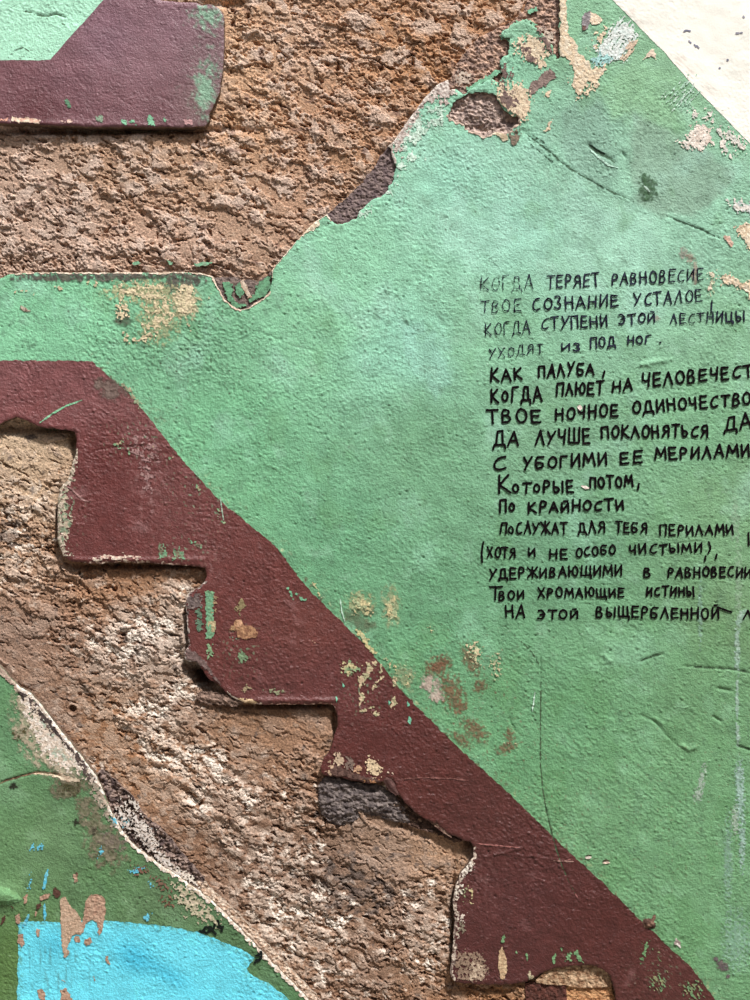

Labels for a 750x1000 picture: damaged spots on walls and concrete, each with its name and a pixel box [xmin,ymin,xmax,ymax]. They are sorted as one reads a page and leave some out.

spalling [0,0,610,346]
crack [528,135,634,202]
spalling [588,144,618,168]
peeling [675,107,747,159]
crack [666,215,720,239]
spalling [0,417,540,1000]
peeling [552,948,584,964]